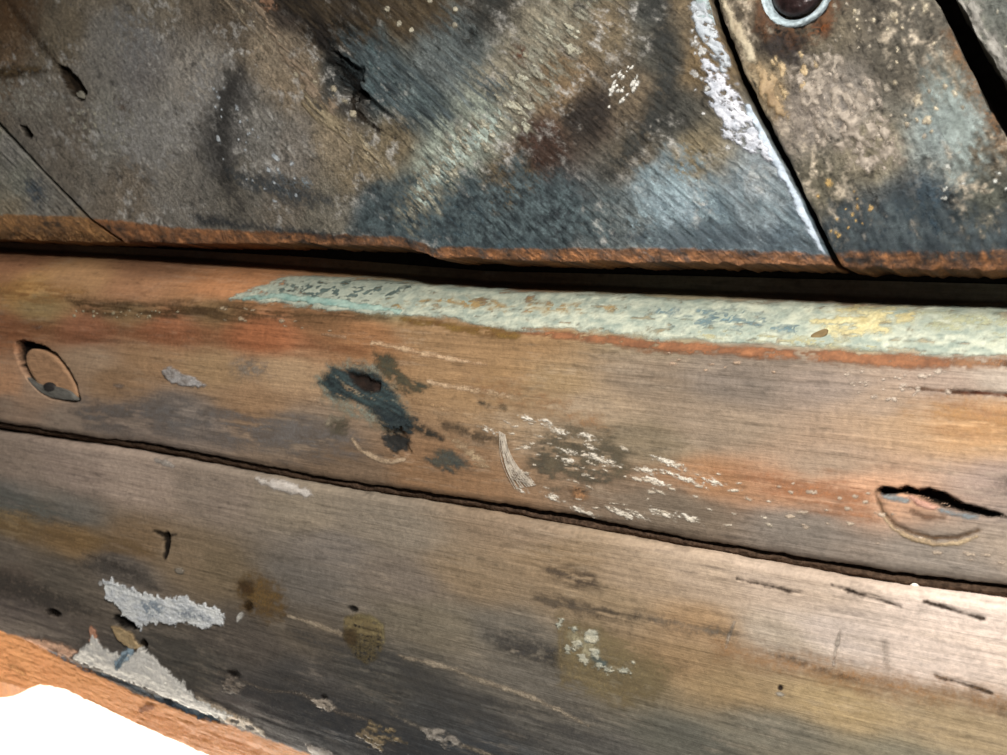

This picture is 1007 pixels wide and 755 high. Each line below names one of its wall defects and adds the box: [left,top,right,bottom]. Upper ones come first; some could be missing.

rust [756,0,837,68]
damp [78,341,630,499]
peeling [507,416,751,522]
crack [877,486,1007,518]
peeling [23,577,265,737]
peeling [556,618,635,676]
peeling [305,744,332,755]